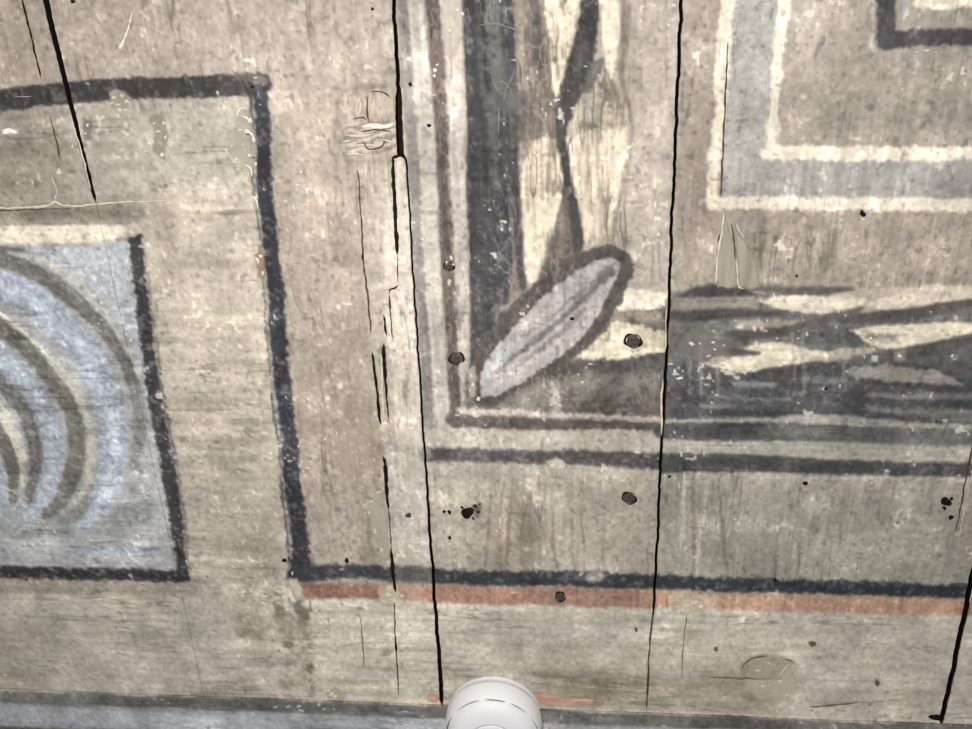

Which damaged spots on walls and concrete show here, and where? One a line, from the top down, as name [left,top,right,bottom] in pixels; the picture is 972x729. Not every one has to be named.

crack [0,0,170,211]
crack [357,0,444,701]
crack [646,0,683,708]
crack [955,447,972,532]
crack [680,615,688,669]
crack [928,566,972,721]